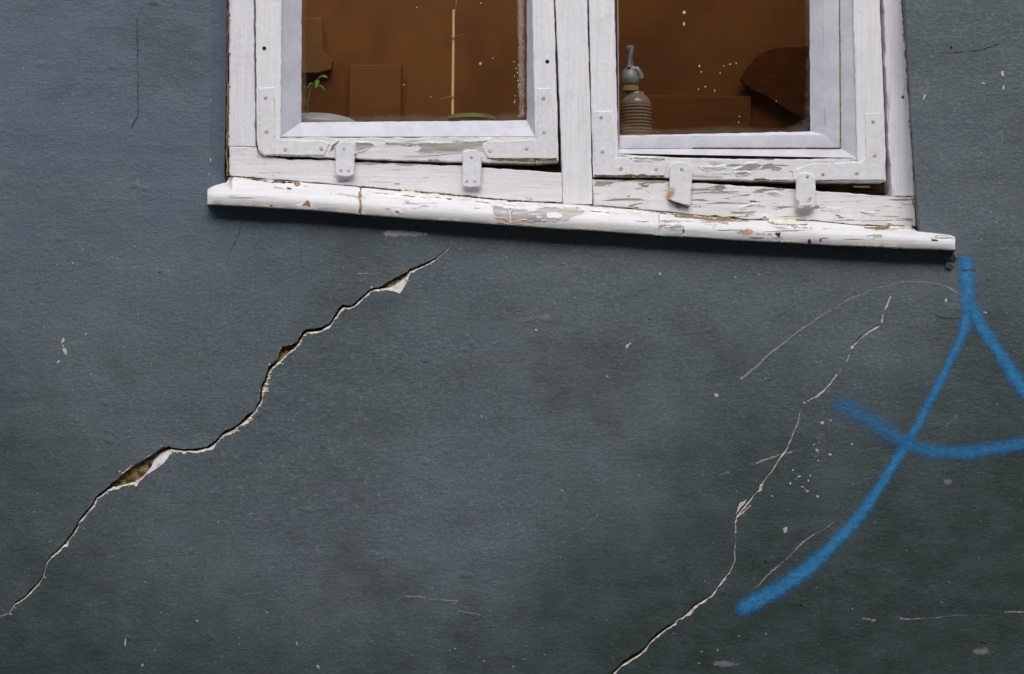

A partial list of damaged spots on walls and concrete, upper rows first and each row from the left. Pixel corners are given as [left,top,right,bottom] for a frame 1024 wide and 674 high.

peeling [229,164,312,208]
peeling [327,161,822,244]
peeling [857,209,914,239]
crack [0,232,452,618]
crack [611,296,891,674]